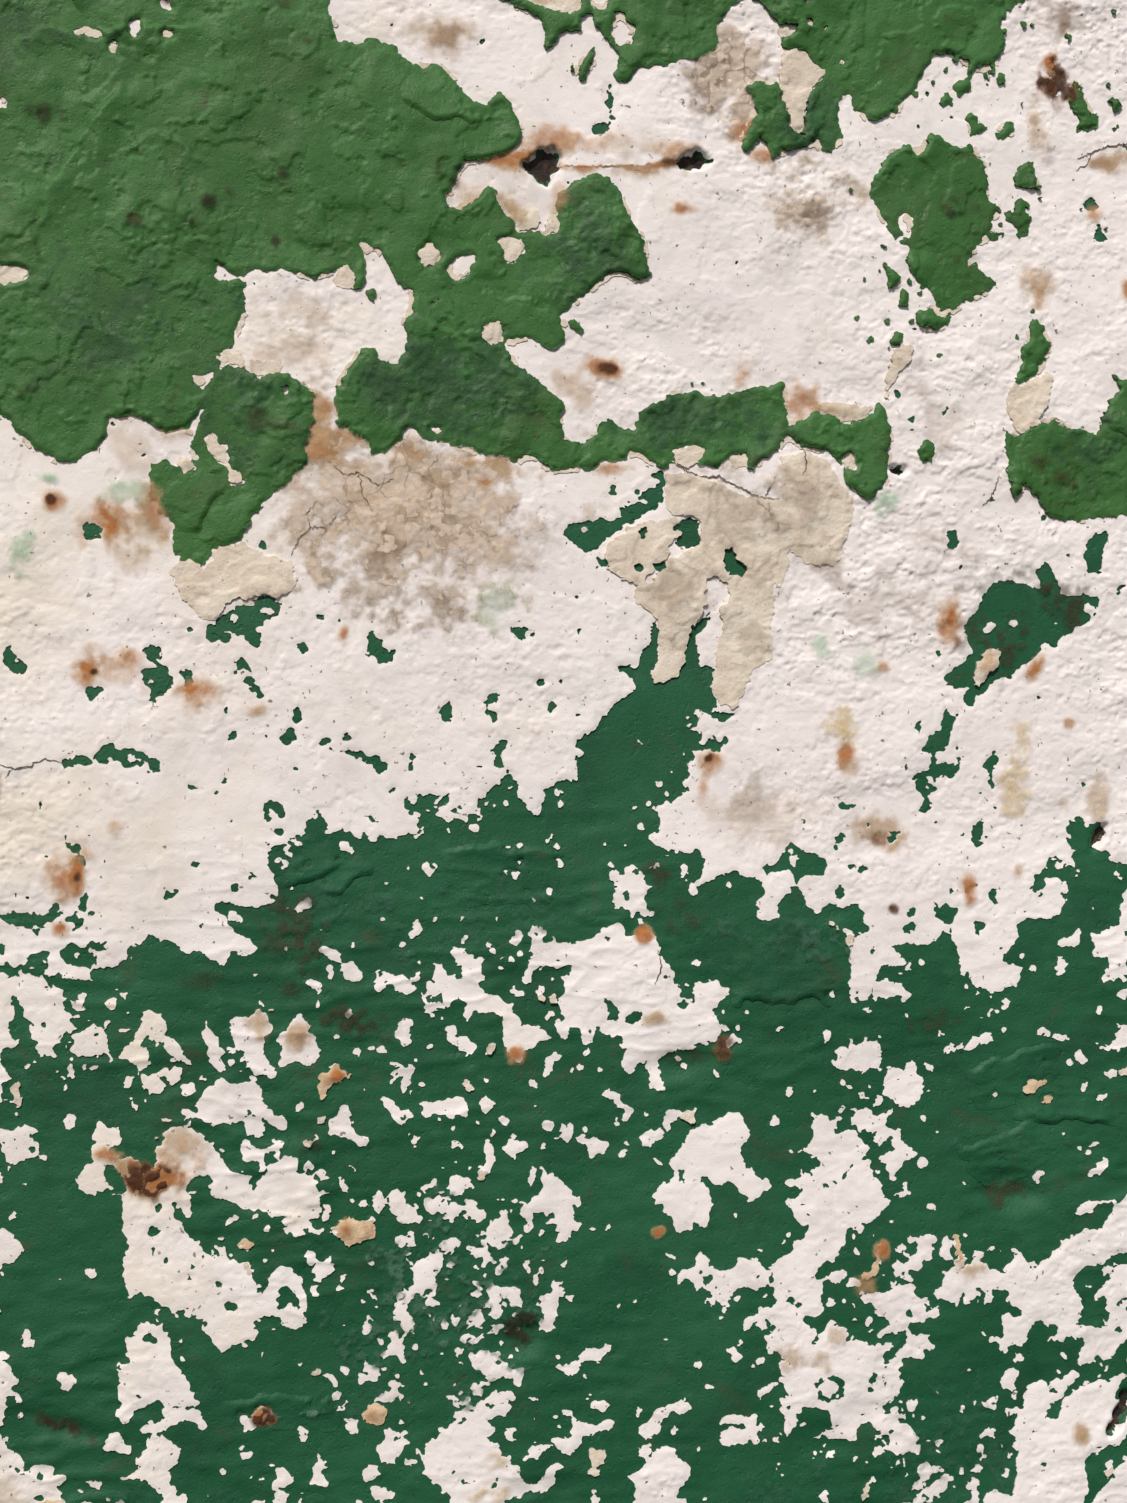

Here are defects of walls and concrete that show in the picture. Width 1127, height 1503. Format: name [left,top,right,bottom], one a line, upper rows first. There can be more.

corrosion [1037,54,1077,100]
corrosion [486,129,595,172]
corrosion [616,143,686,174]
corrosion [587,358,621,378]
peeling [0,0,1127,1116]
corrosion [47,858,83,901]
corrosion [94,1131,199,1199]
peeling [541,1108,772,1233]
peeling [75,1000,582,1503]
peeling [666,1029,1127,1503]
peeling [0,1329,124,1503]
peeling [627,1398,707,1503]